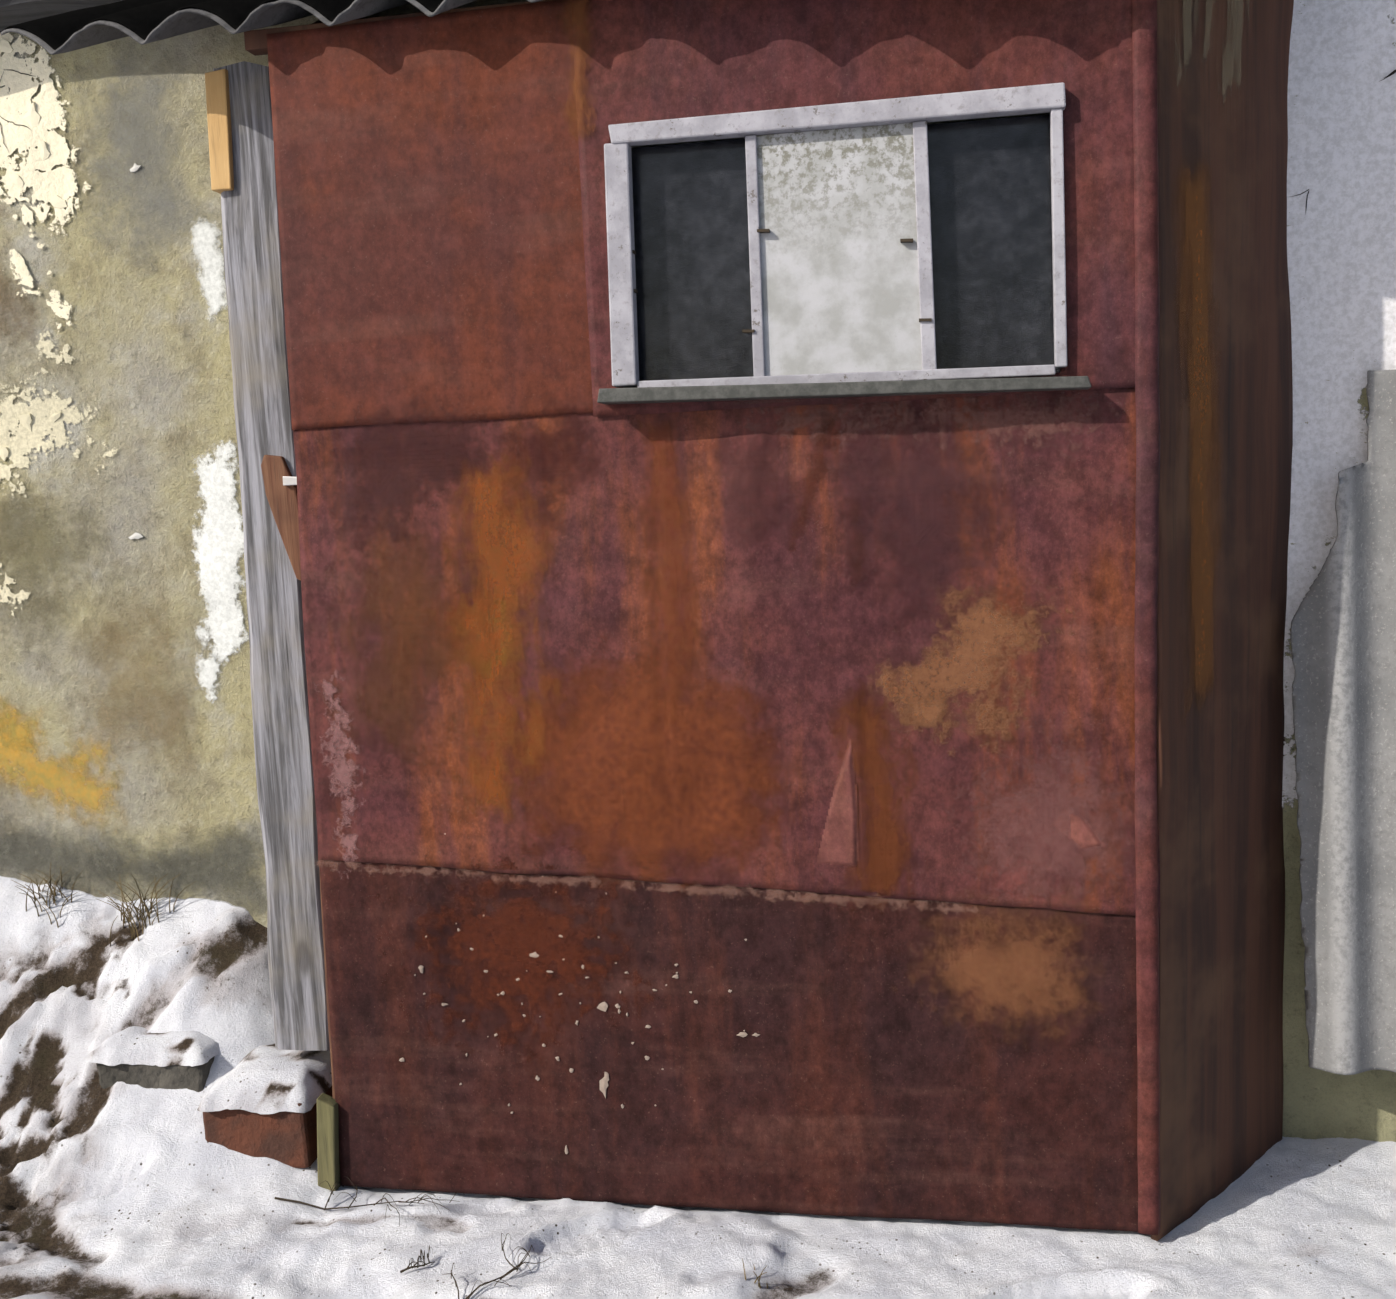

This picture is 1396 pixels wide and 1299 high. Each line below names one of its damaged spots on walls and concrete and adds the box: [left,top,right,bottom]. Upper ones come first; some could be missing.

peeling [0,33,91,249]
peeling [0,249,118,498]
rust [1180,173,1219,695]
peeling [1282,0,1396,807]
peeling [0,563,30,615]
peeling [196,656,219,701]
rust [416,856,632,1048]